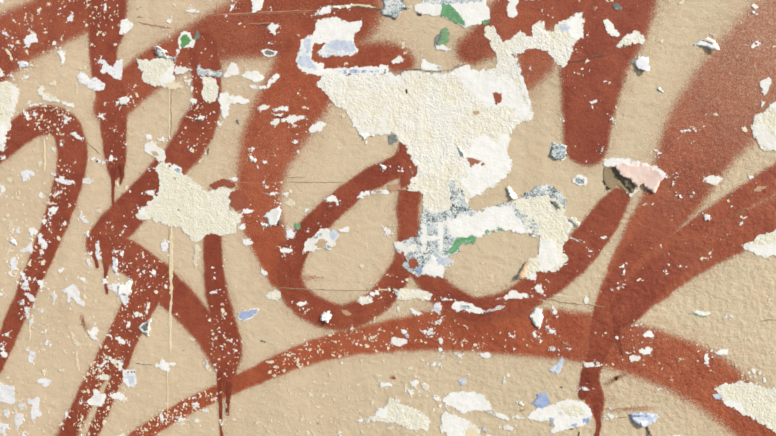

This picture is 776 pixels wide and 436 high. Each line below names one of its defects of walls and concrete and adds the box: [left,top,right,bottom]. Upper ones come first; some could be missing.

peeling [631,56,650,72]
peeling [693,33,720,50]
peeling [739,77,776,151]
peeling [598,144,695,206]
peeling [699,175,723,185]
peeling [0,0,310,436]
peeling [116,0,645,436]
peeling [733,229,776,260]
peeling [581,320,666,368]
peeling [672,344,728,371]
peeling [713,359,776,433]
peeling [629,412,660,436]